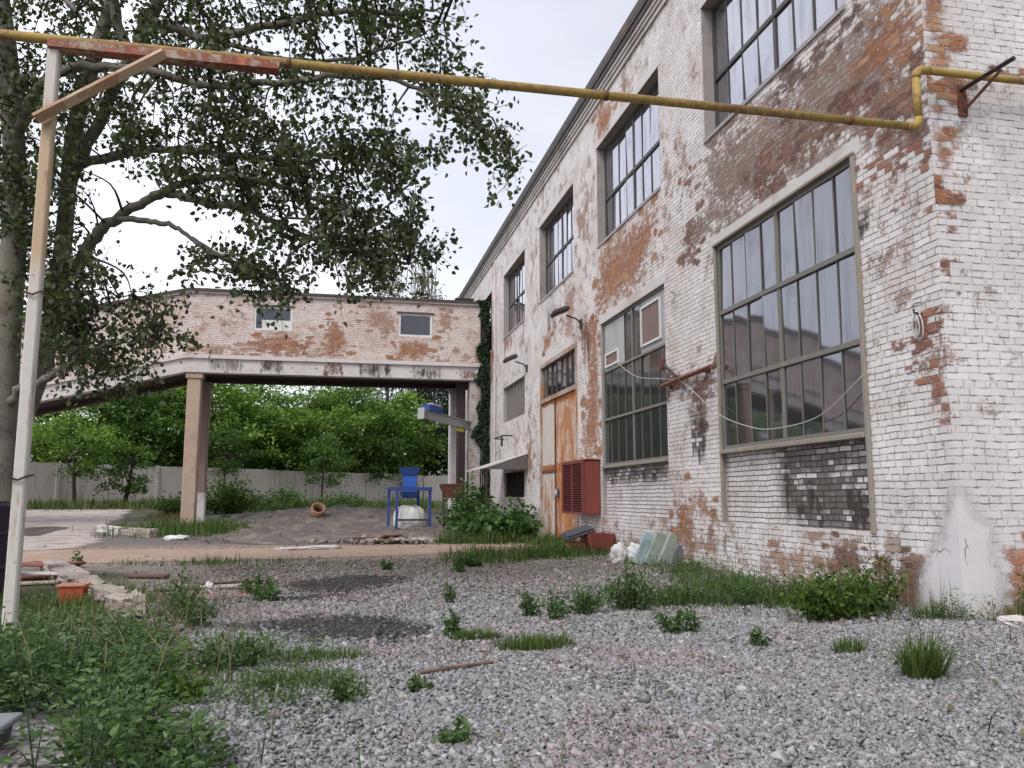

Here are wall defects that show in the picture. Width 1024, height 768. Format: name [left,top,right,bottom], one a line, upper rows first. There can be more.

peeling [676,0,977,270]
peeling [940,258,961,295]
peeling [185,305,459,361]
peeling [542,193,663,459]
damp [691,408,706,465]
peeling [667,472,718,559]
damp [780,439,871,530]
peeling [767,531,925,608]